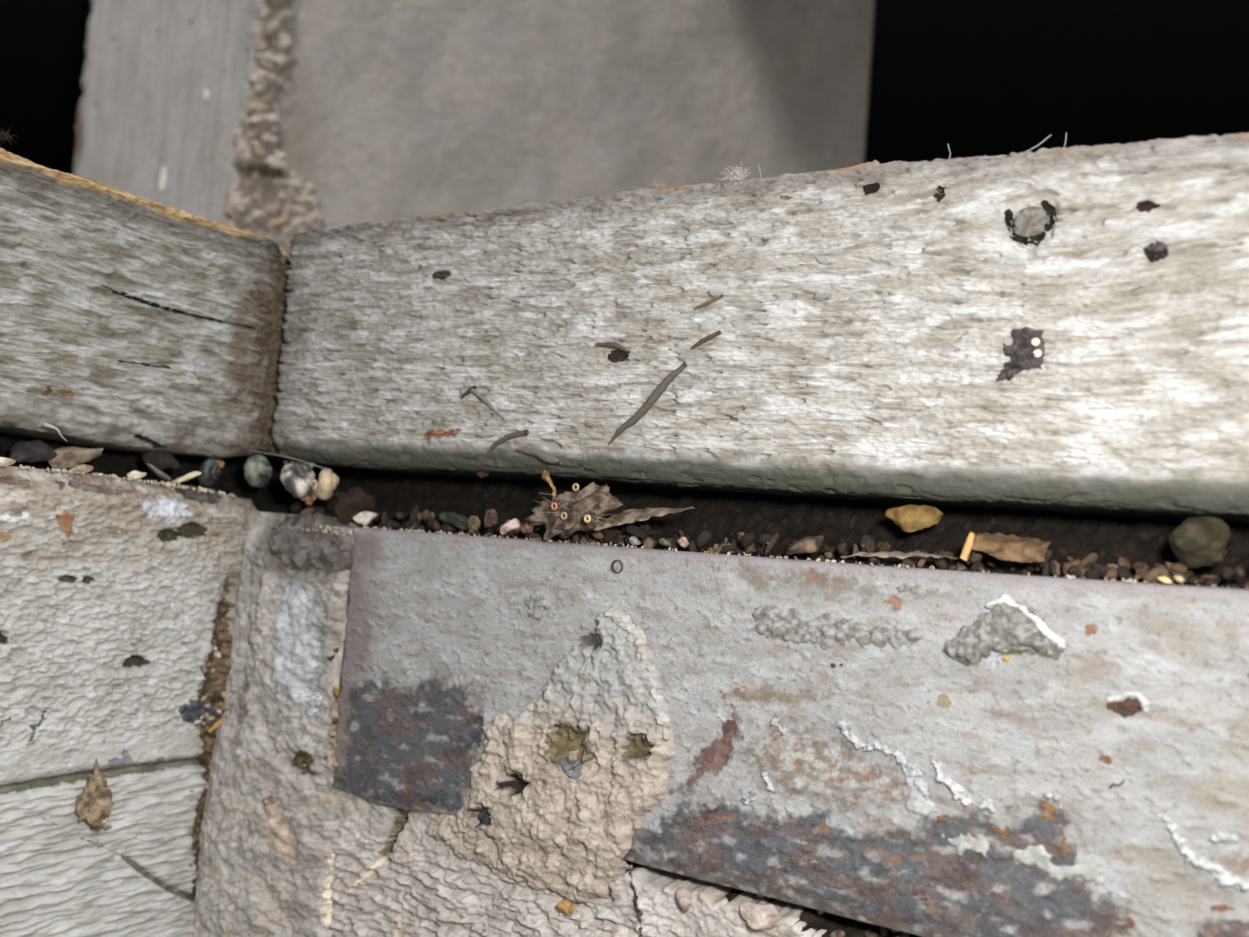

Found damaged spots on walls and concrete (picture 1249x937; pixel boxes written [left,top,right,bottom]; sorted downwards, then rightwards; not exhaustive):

crack [104,285,255,329]
spalling [579,633,602,649]
rust [341,678,484,812]
spalling [496,773,529,797]
peeling [742,715,996,816]
rust [643,686,1135,937]
peeling [1158,813,1249,893]